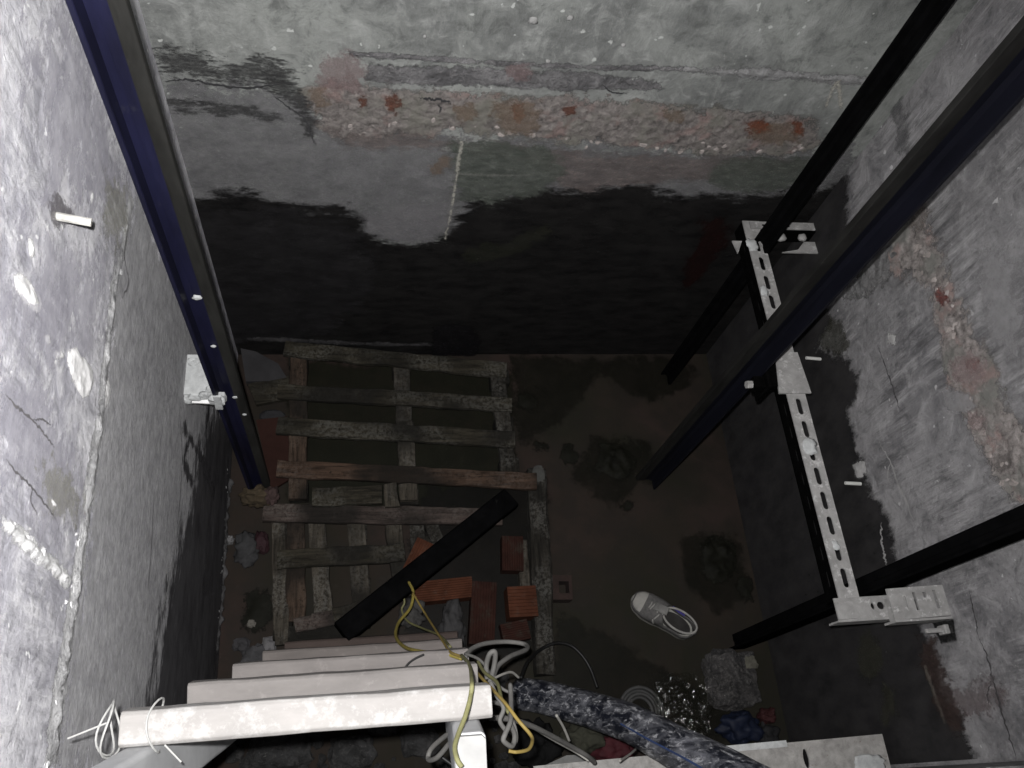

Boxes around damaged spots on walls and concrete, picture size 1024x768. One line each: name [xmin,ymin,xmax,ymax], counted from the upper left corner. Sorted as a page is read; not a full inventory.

spalling [298,76,824,159]
leakage [161,70,822,355]
crack [6,395,53,445]
crack [5,459,56,520]
spalling [888,216,1024,503]
crack [969,592,1016,756]